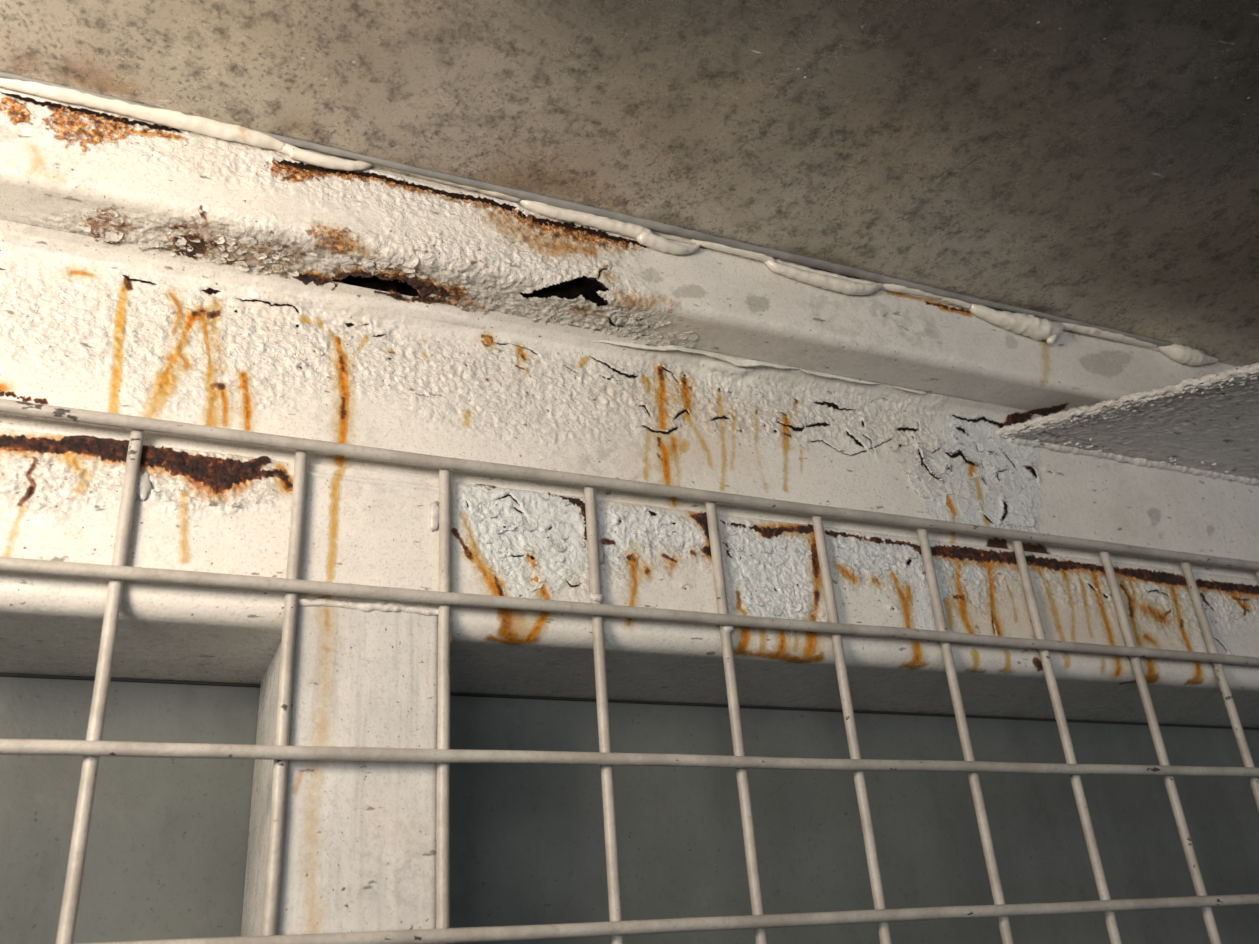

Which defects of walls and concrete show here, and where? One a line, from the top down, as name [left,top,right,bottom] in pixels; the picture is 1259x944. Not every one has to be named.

rust [0,92,187,153]
rust [267,159,646,256]
spalling [331,253,456,304]
spalling [520,275,925,394]
rust [642,366,734,506]
crack [777,401,1052,524]
peeling [892,412,1045,533]
rust [1003,403,1069,426]
rust [451,528,548,645]
peeling [456,483,708,599]
peeling [723,525,816,621]
rust [733,591,823,663]